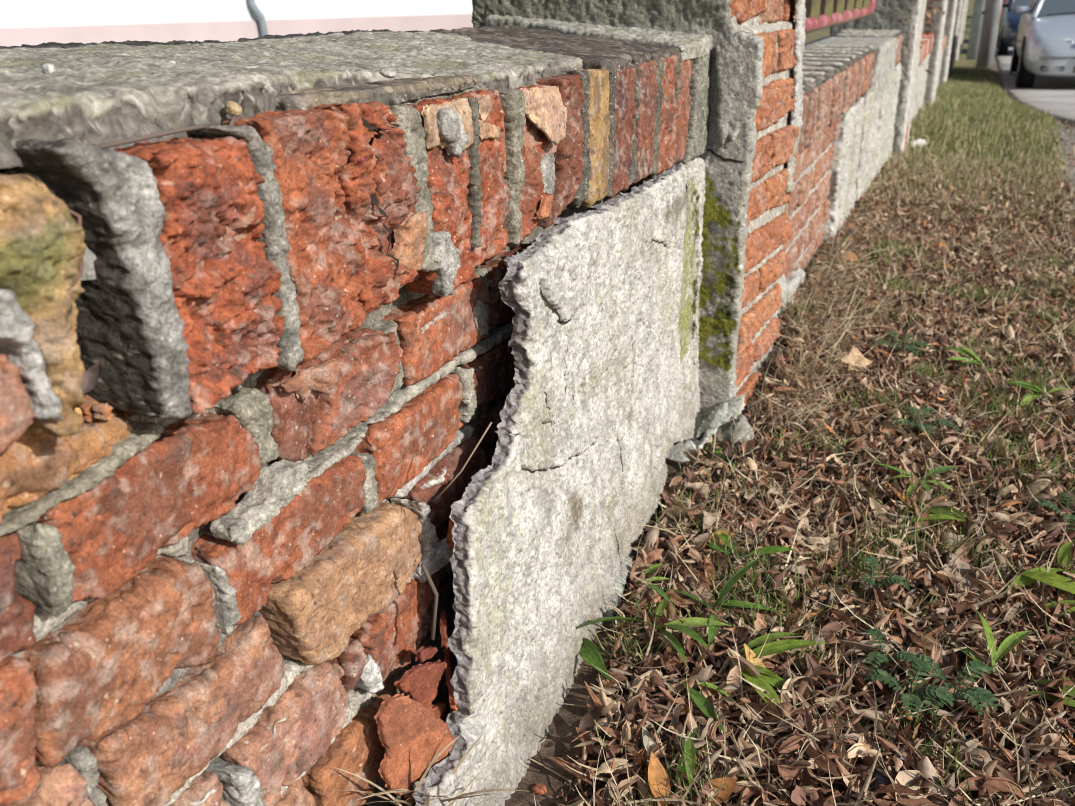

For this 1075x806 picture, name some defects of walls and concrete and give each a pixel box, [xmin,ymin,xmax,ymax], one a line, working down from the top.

crack [362,117,400,278]
peeling [114,0,808,806]
crack [513,282,575,438]
crack [521,439,623,473]